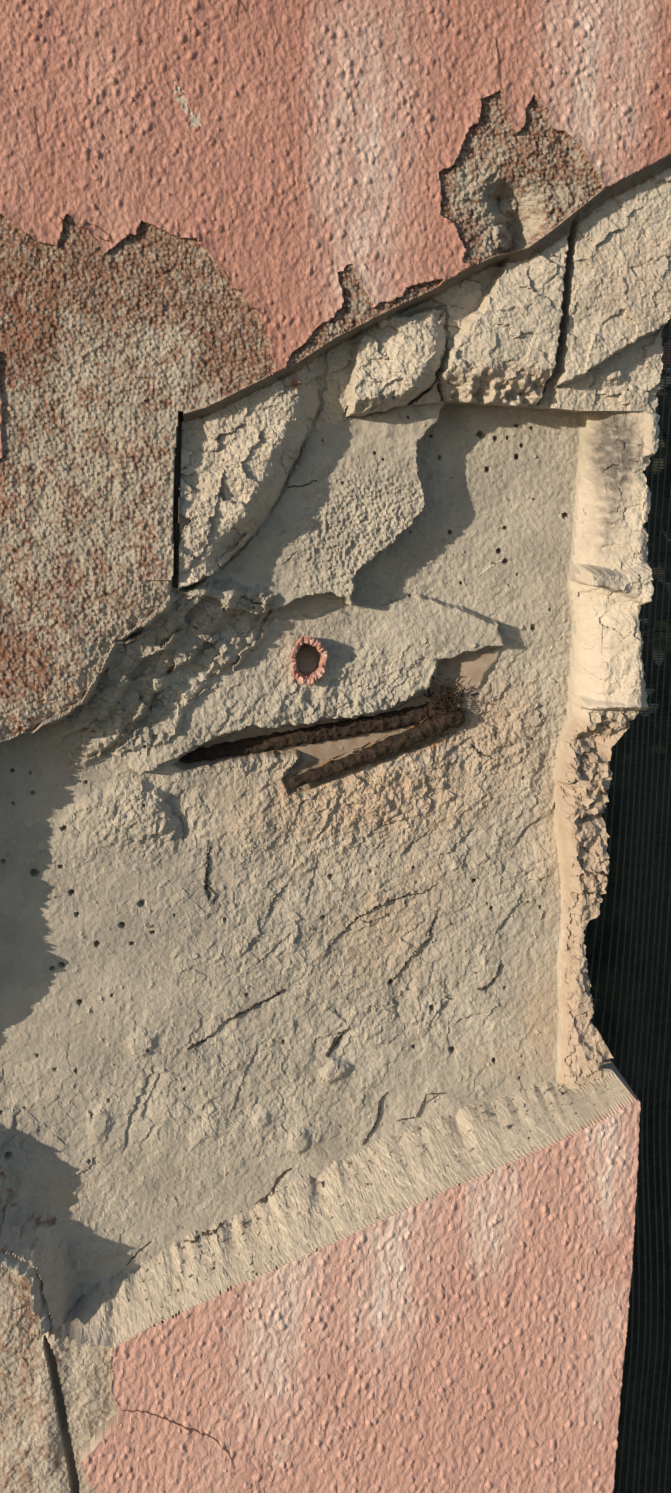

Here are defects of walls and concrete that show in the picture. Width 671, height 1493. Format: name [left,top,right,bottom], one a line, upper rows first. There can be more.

peeling [174,81,201,128]
peeling [438,90,604,265]
spalling [0,168,671,1348]
rust [160,668,561,976]
crack [122,1410,235,1470]